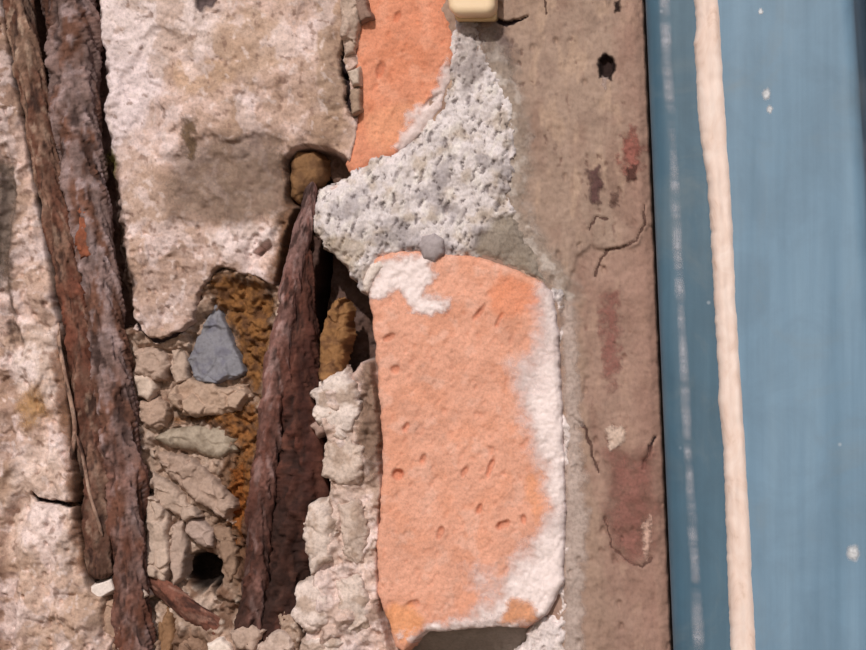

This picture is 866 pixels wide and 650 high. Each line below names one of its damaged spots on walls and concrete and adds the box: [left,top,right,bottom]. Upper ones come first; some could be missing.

spalling [340,0,376,57]
crack [341,45,352,113]
spalling [348,66,364,118]
crack [594,204,646,277]
efflorescence [369,254,450,315]
spalling [3,0,331,650]
rust [175,154,301,543]
rust [19,388,44,425]
crack [34,493,79,507]
rust [52,330,87,572]
damp [359,362,383,477]
damp [399,285,588,650]